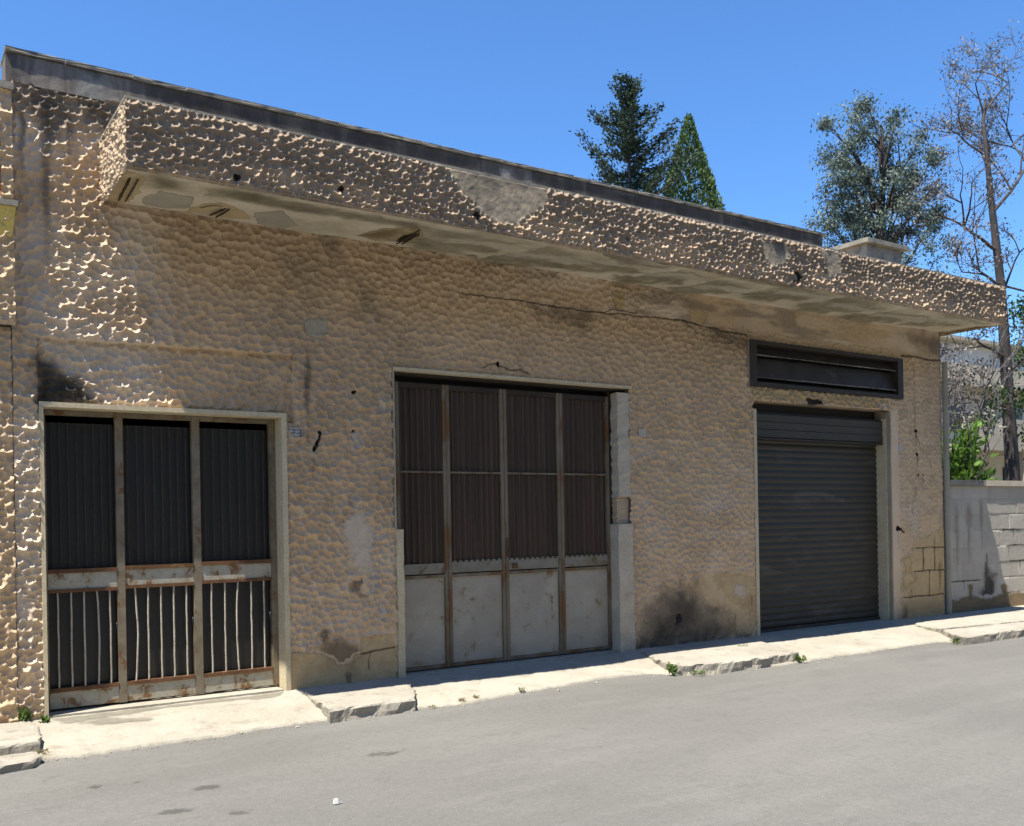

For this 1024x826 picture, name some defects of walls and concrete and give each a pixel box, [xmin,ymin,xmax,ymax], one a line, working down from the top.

flaking render [435,164,547,226]
crack [462,292,747,336]
flaking render [343,493,378,592]
corrosion [48,559,271,574]
corrosion [48,577,272,594]
damp [648,594,726,639]
corrosion [50,666,273,694]
flaking render [291,634,398,690]